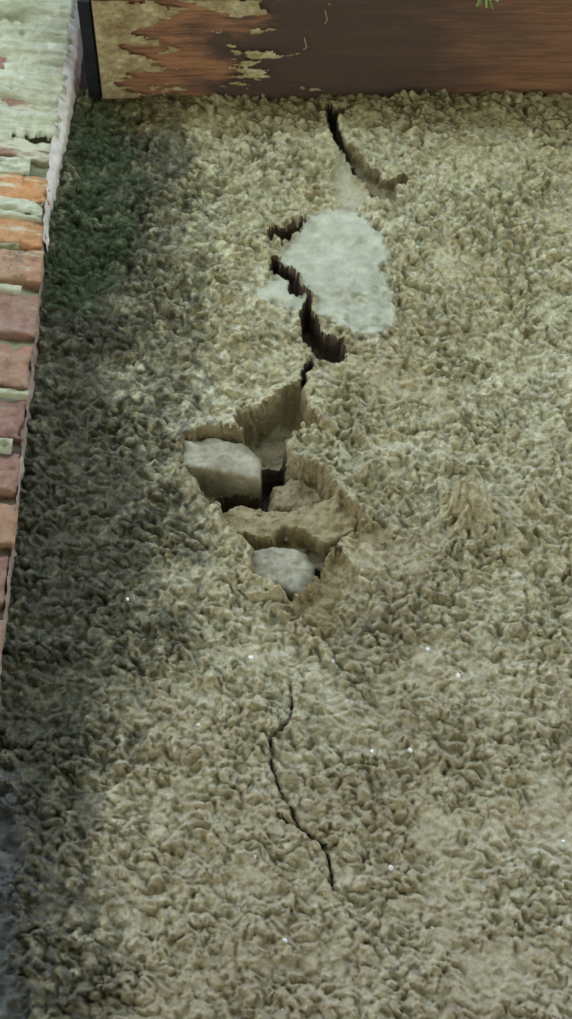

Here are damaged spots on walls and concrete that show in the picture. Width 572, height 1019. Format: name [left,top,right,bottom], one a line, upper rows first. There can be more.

peeling [92,0,268,99]
peeling [221,44,300,89]
flaking render [0,0,83,255]
crack [325,102,411,209]
flaking render [0,284,22,295]
peeling [255,275,307,311]
crack [266,215,348,389]
flaking render [0,388,29,400]
flaking render [0,438,13,454]
leakage [0,90,207,1019]
spalling [179,376,393,641]